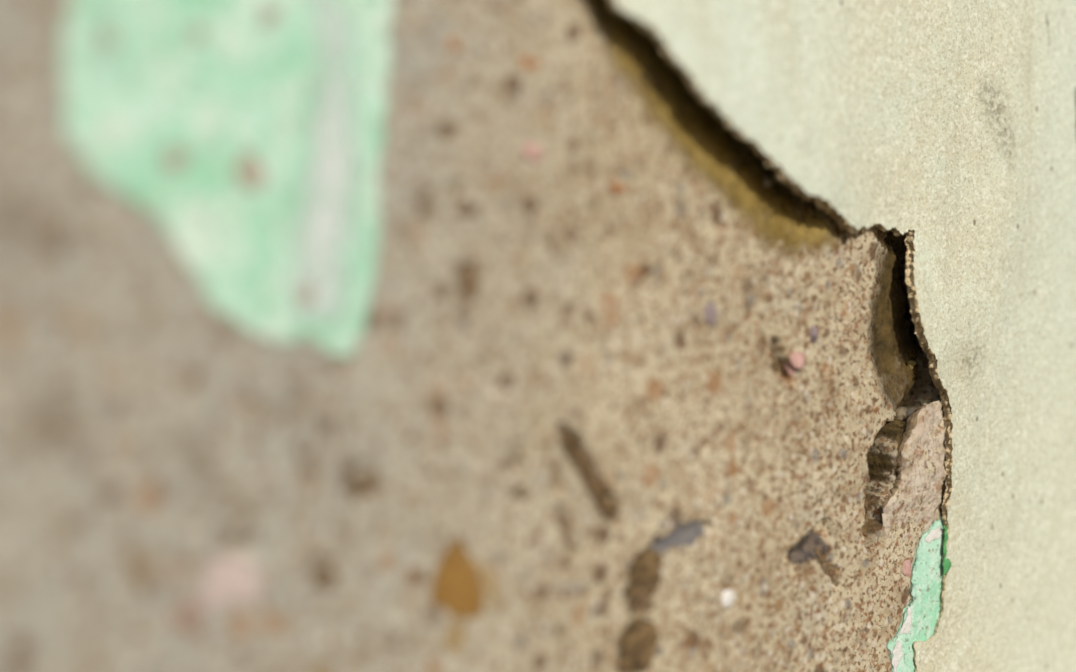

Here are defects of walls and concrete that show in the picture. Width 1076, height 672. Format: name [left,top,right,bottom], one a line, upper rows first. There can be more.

peeling [61,0,395,358]
spalling [459,261,480,299]
peeling [609,0,986,672]
spalling [347,472,382,497]
spalling [559,432,619,522]
crack [861,414,905,534]